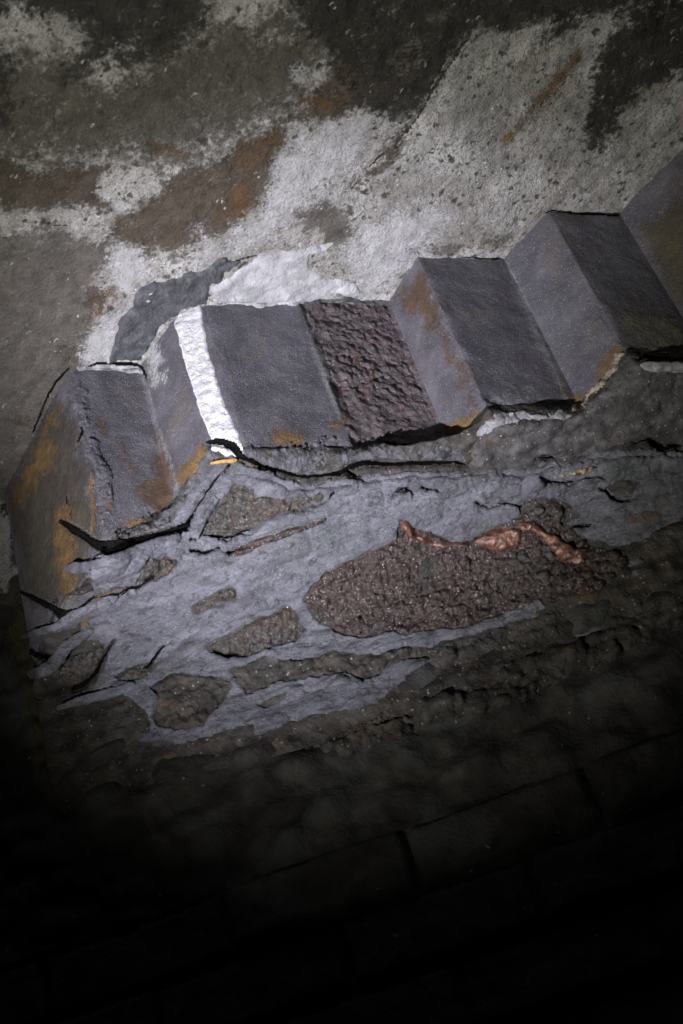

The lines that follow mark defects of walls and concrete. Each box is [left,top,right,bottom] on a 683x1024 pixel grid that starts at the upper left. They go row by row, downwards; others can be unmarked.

water stain [0,0,683,366]
crack [33,362,146,433]
crack [635,439,682,451]
crack [58,438,470,556]
crack [538,456,631,502]
corrosion [53,504,81,593]
peeling [21,305,683,758]
crack [20,576,155,619]
crack [29,649,51,659]
crack [72,643,113,690]
crack [142,646,164,669]